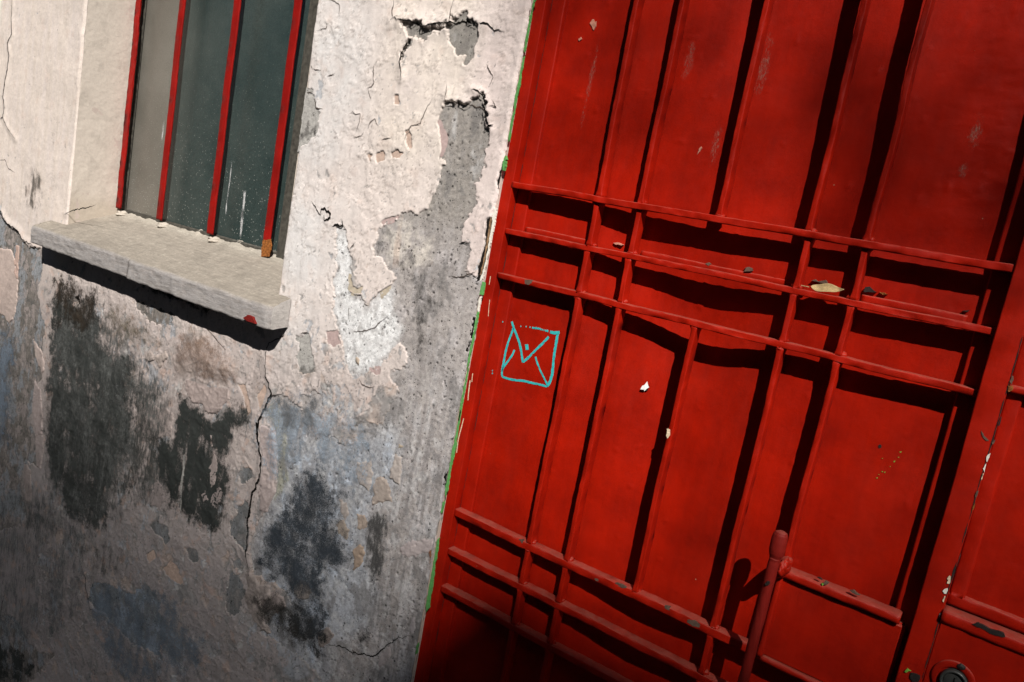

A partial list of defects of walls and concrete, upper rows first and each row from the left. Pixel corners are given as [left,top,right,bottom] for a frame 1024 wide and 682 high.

crack [351,65,497,140]
spalling [402,11,479,65]
crack [390,0,501,80]
peeling [508,0,536,142]
damp [0,275,248,682]
crack [245,328,308,576]
damp [249,390,375,659]
spalling [184,87,490,682]